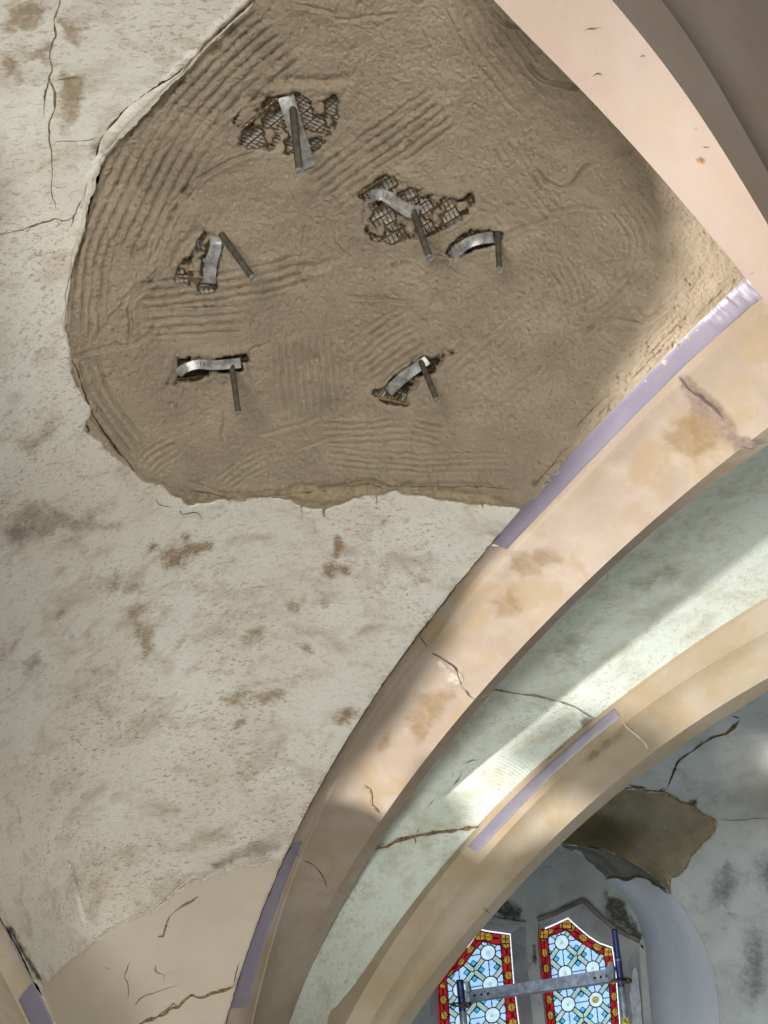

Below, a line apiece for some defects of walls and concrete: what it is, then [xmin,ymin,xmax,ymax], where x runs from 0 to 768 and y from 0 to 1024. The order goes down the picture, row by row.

crack [0,0,102,235]
flaking render [65,0,752,509]
crack [533,279,735,486]
leakage [151,536,212,567]
leakage [324,537,349,577]
crack [105,534,594,1024]
flaking render [561,787,717,895]
crack [624,716,740,795]